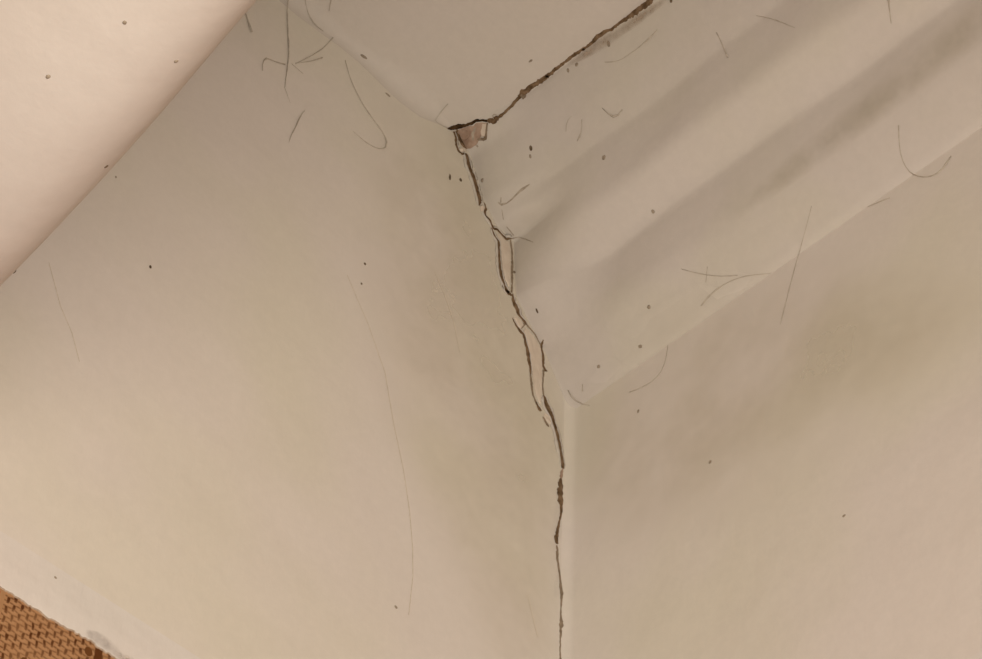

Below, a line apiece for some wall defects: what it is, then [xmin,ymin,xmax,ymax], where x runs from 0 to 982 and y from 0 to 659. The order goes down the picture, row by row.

flaking render [455,122,488,152]
crack [447,0,653,659]